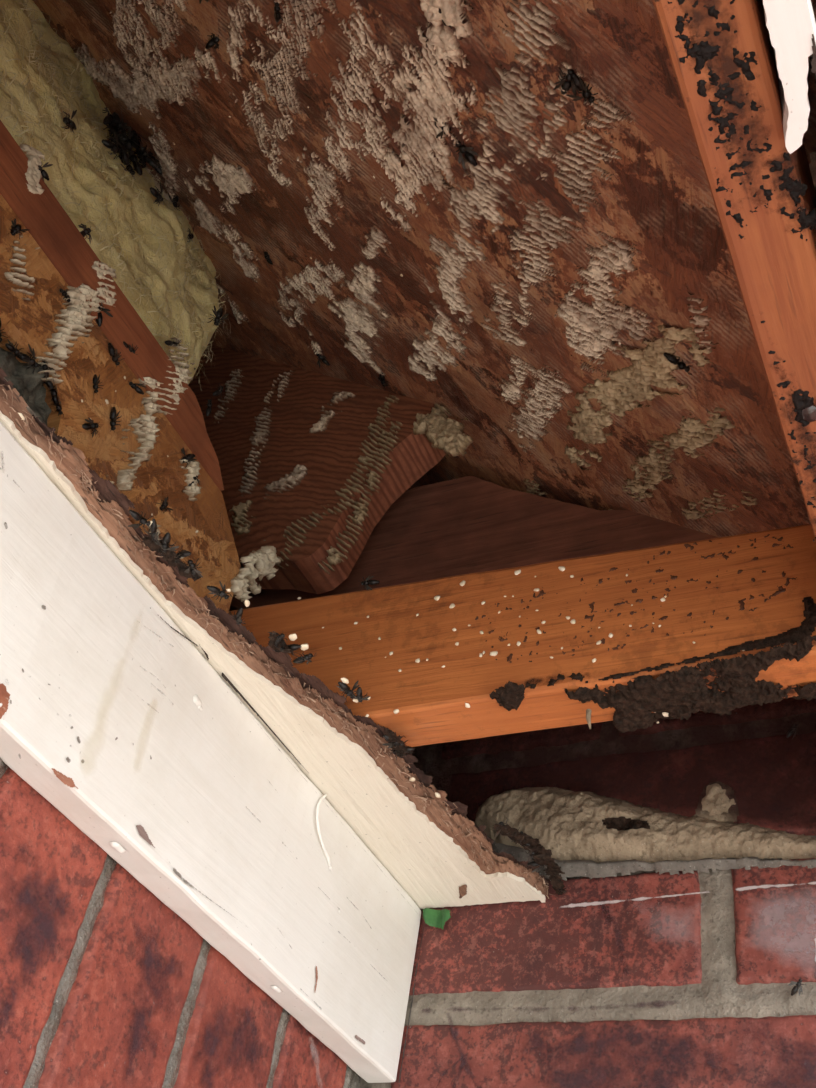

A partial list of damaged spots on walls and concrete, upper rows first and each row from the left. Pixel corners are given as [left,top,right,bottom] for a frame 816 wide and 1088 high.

water stain [668,0,816,242]
water stain [777,381,816,523]
peeling [0,683,10,719]
peeling [136,825,155,848]